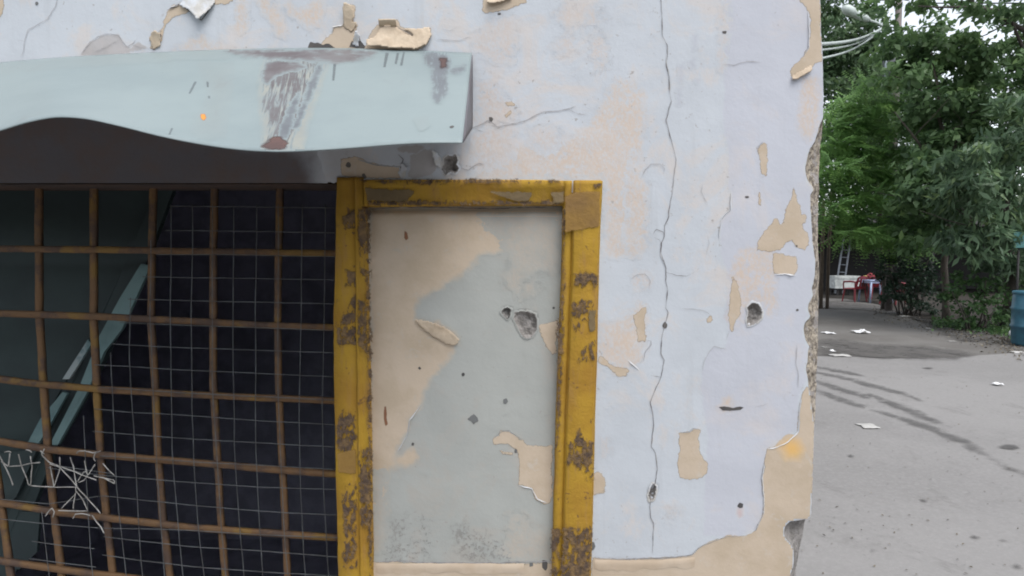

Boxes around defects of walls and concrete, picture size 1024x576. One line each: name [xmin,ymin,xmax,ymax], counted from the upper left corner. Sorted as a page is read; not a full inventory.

corrosion [0,49,378,183]
peeling [322,2,431,50]
peeling [368,206,562,576]
crack [472,106,584,133]
crack [600,4,693,560]
peeling [591,0,823,576]